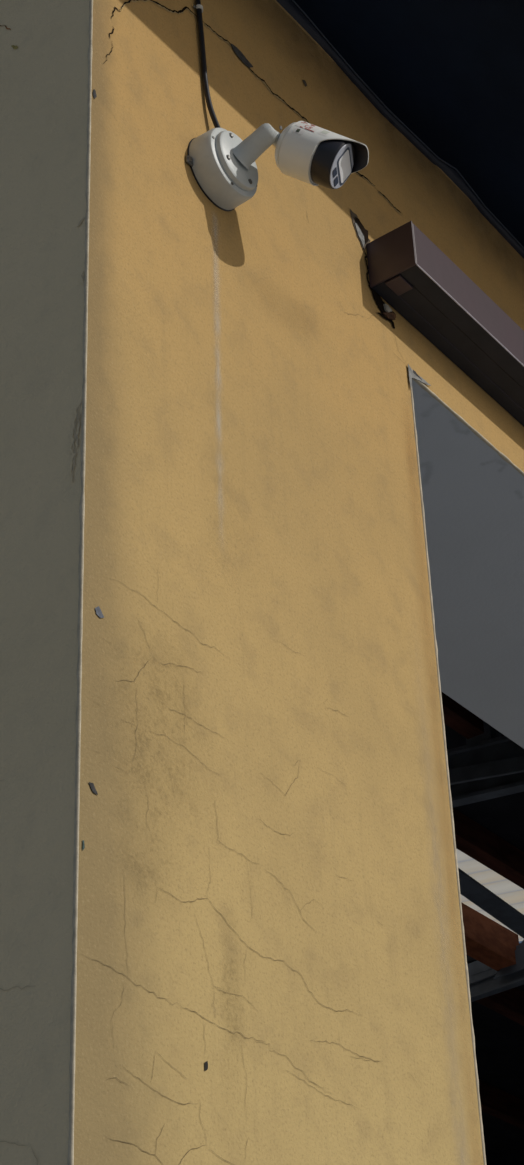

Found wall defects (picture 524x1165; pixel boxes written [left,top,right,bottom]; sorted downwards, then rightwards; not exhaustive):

crack [103,0,309,123]
crack [355,172,403,215]
flaking render [350,209,396,328]
crack [86,796,358,1165]